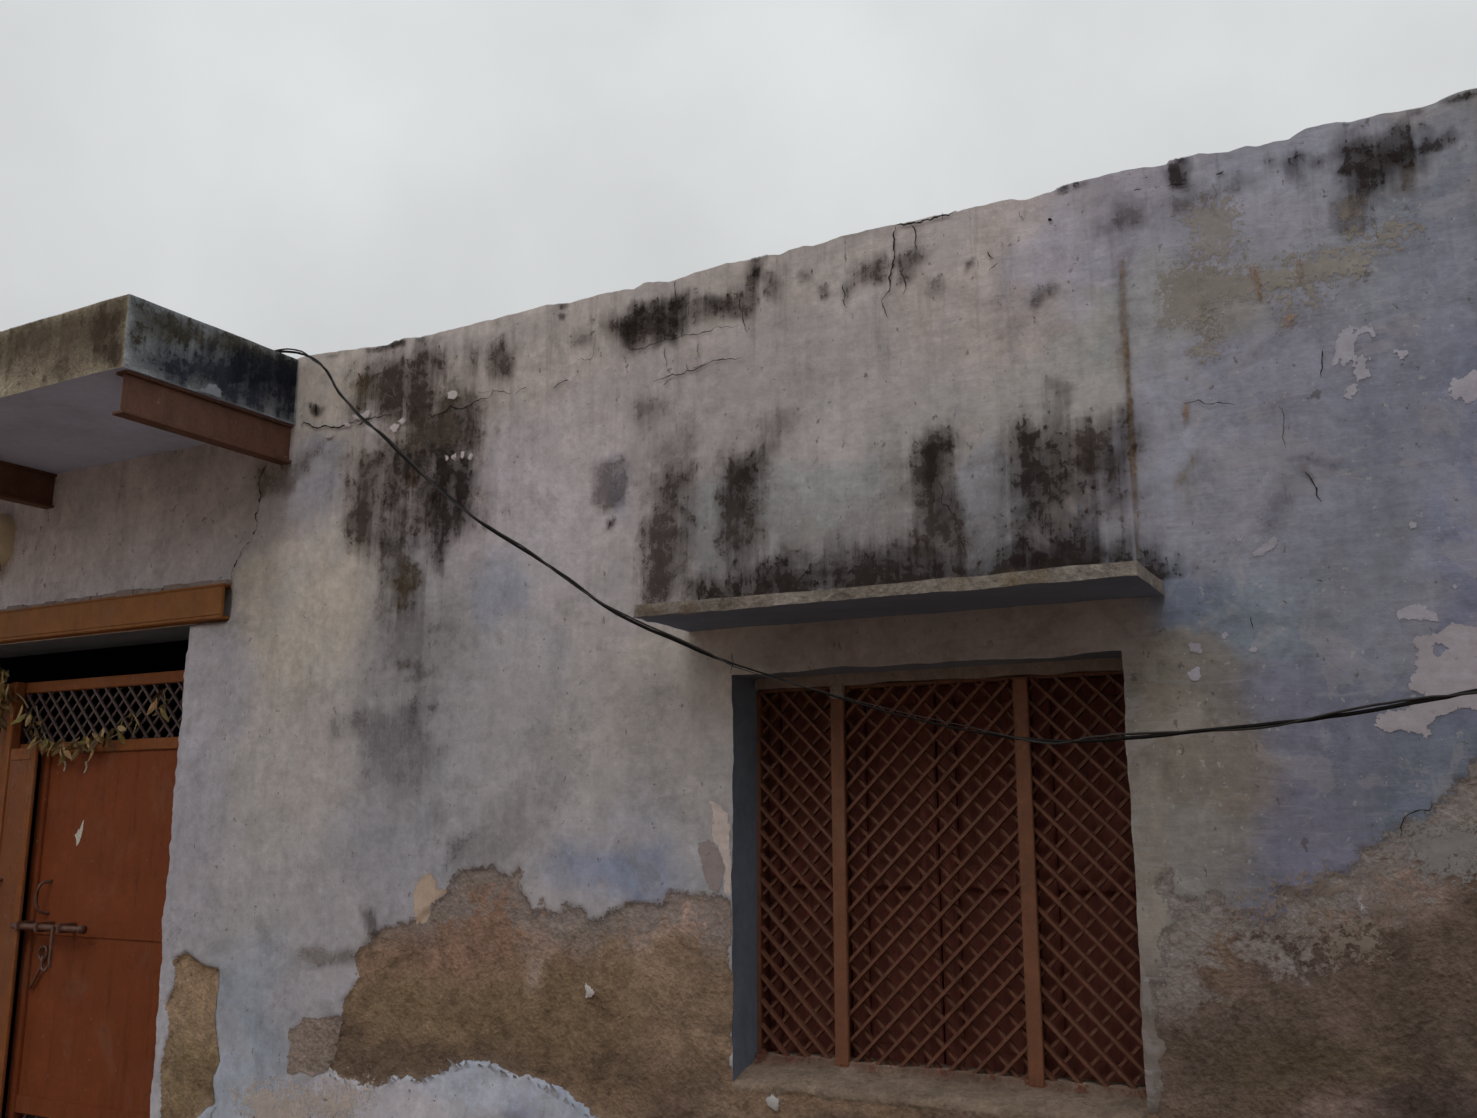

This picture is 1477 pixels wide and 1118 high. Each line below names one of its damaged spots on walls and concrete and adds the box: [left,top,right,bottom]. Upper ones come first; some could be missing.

water stain [1337,121,1455,199]
water stain [0,299,317,420]
water stain [609,254,776,349]
crack [881,211,956,318]
peeling [1331,324,1376,400]
peeling [1447,369,1477,405]
water stain [344,338,485,611]
water stain [636,408,1181,615]
peeling [1374,602,1477,739]
spalling [286,799,982,1118]
spalling [1148,758,1477,1118]
spalling [159,953,220,1118]